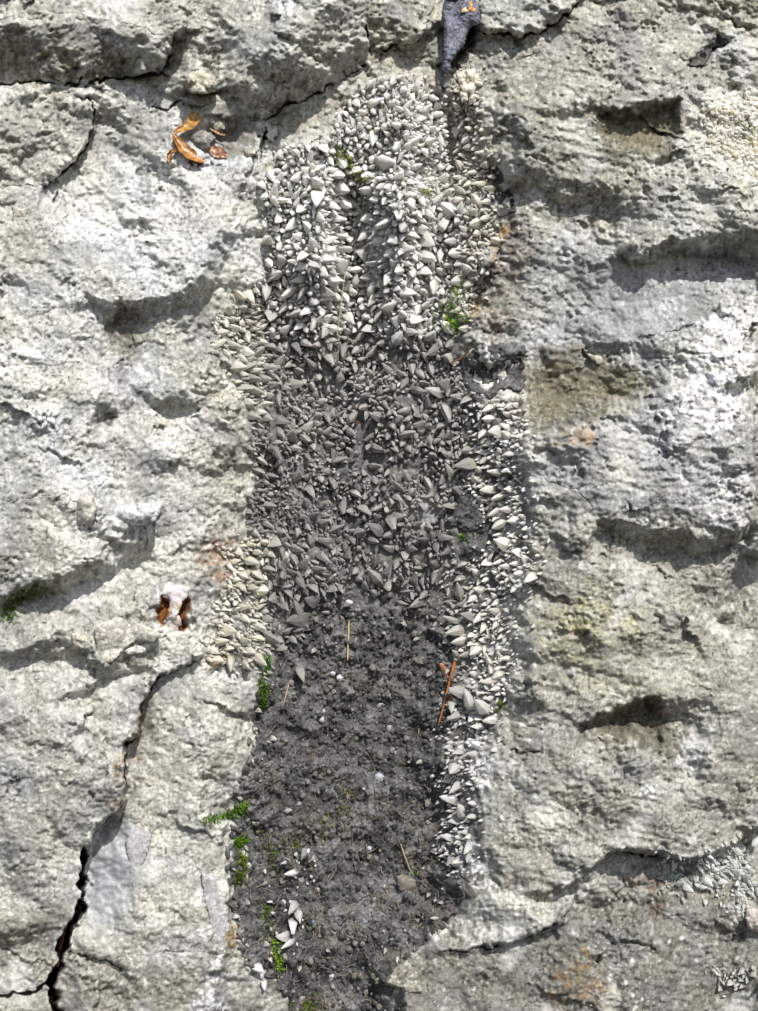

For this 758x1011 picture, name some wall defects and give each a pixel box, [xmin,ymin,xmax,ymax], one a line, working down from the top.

crack [0,661,196,1011]
crack [623,852,686,862]
crack [448,945,499,953]